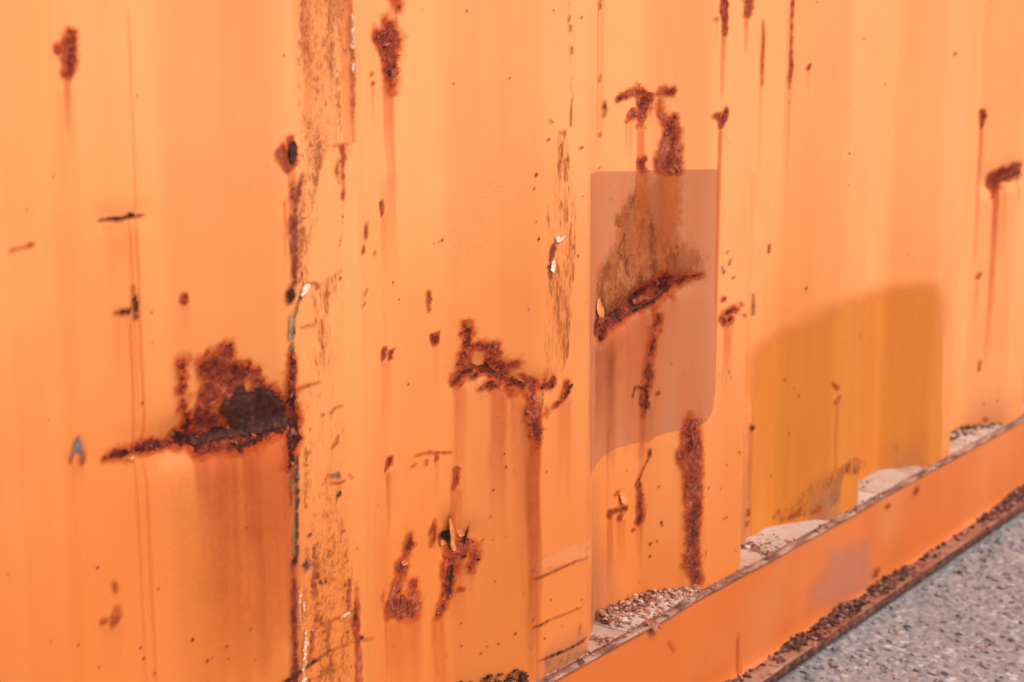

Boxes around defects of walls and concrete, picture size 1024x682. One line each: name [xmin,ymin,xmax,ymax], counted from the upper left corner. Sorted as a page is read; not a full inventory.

corrosion [55,27,78,78]
corrosion [371,0,403,95]
corrosion [717,0,730,35]
corrosion [743,0,754,18]
corrosion [616,84,684,191]
spalling [594,178,706,373]
corrosion [450,319,574,511]
corrosion [633,312,664,418]
corrosion [607,491,628,521]
corrosion [677,411,722,585]